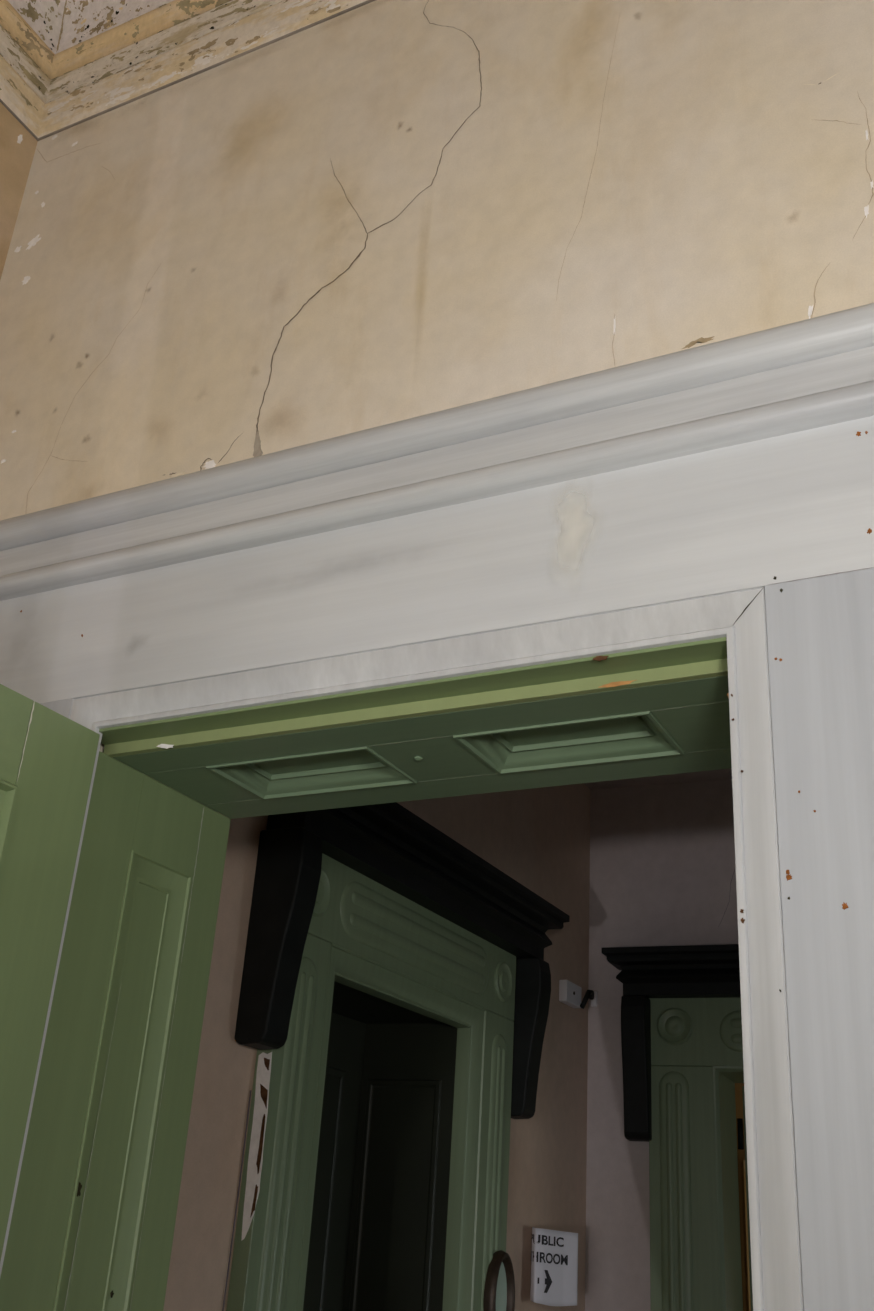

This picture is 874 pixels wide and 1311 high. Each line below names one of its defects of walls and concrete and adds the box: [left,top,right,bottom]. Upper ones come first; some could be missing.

peeling [0,0,348,118]
crack [822,95,874,238]
crack [165,0,482,477]
crack [808,263,830,319]